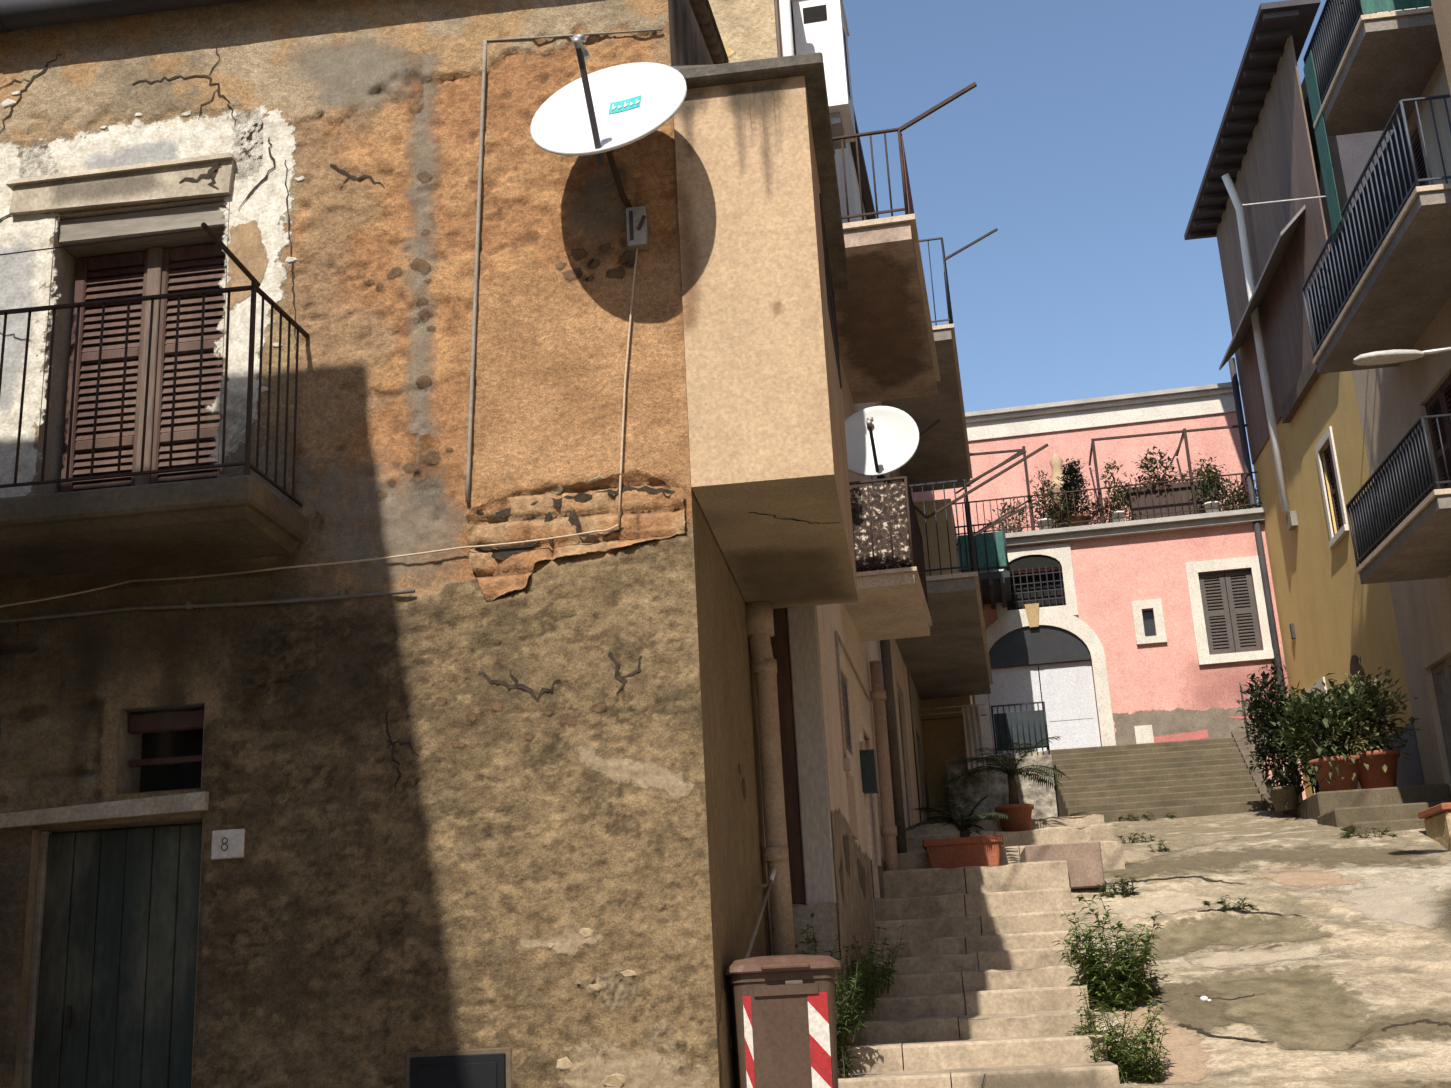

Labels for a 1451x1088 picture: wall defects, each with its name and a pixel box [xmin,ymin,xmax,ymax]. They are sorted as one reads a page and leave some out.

crack [0,54,62,131]
crack [132,47,236,126]
crack [179,163,222,189]
peeling [0,105,305,498]
spalling [466,469,686,601]